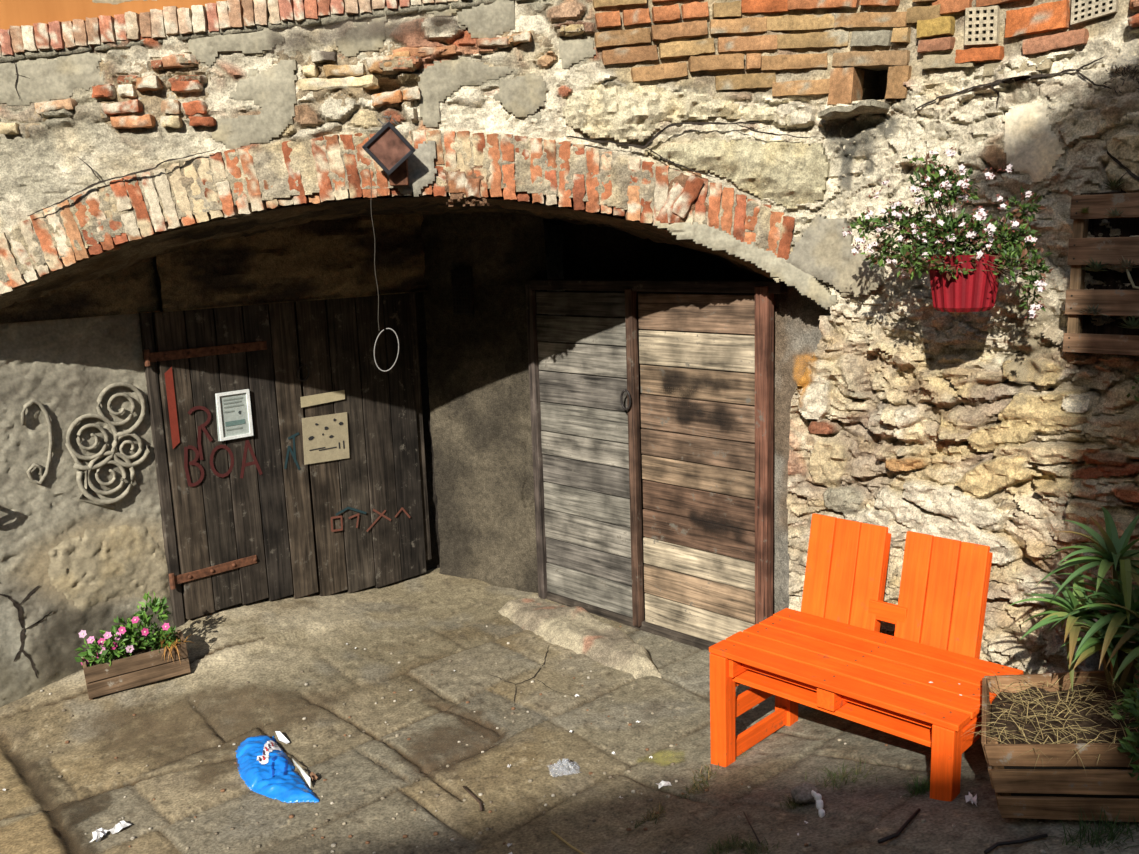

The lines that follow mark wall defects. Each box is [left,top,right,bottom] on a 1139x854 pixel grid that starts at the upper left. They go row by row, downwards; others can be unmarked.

spalling [0,0,596,150]
spalling [852,65,898,104]
flaking render [398,141,490,207]
flaking render [1003,100,1068,182]
crack [0,583,53,678]
crack [489,646,572,706]